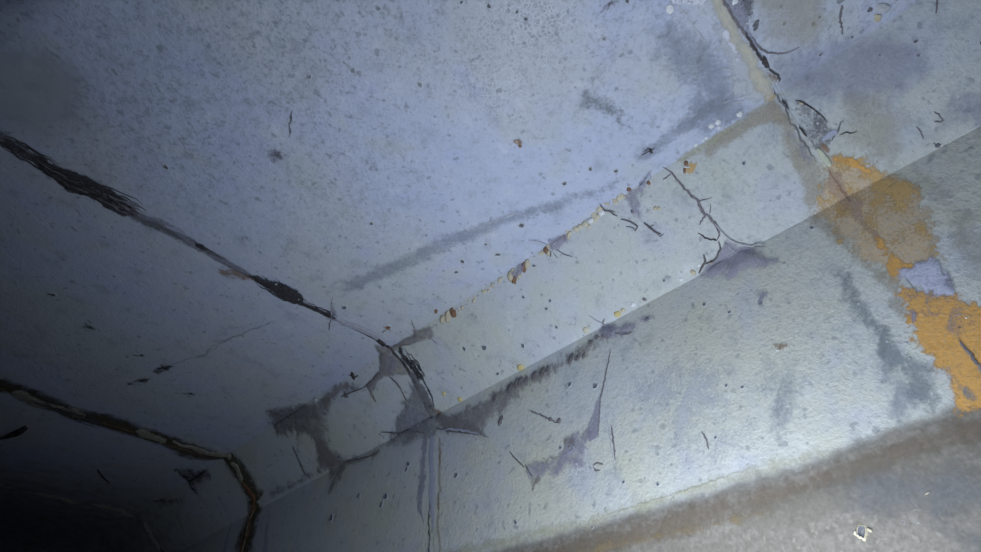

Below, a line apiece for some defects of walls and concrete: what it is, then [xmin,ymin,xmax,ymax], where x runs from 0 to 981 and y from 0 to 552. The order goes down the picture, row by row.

crack [722,0,851,202]
crack [0,132,338,322]
crack [397,346,441,416]
crack [663,167,720,241]
corrosion [814,153,981,416]
crack [958,340,981,372]